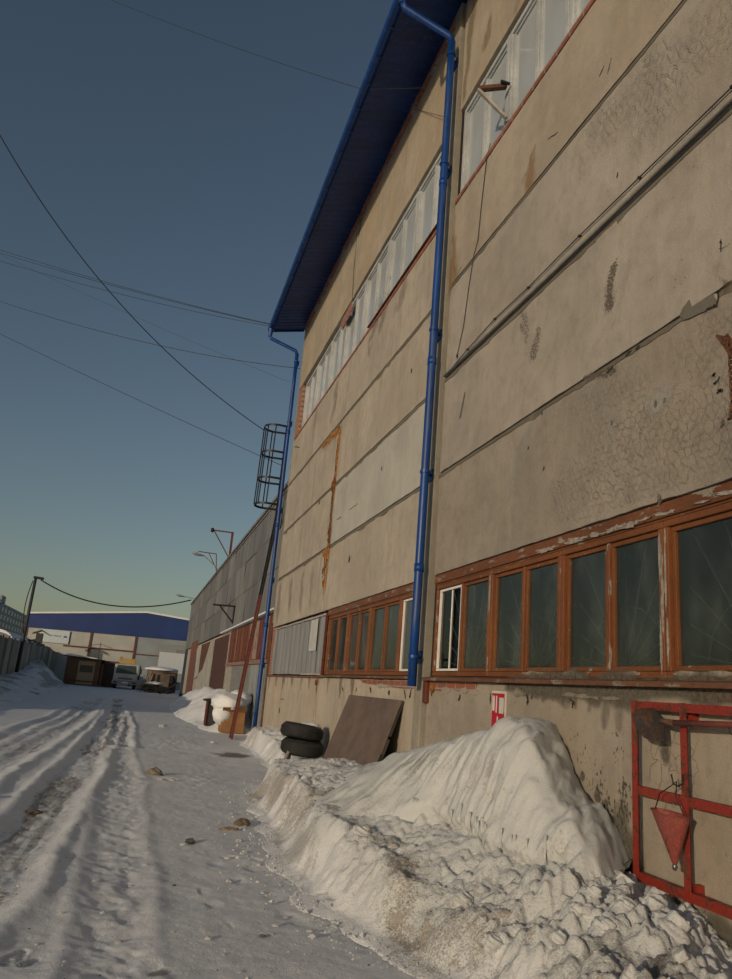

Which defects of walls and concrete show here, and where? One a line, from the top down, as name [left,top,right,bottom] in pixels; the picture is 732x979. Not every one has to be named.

crack [579,0,732,178]
spalling [603,261,617,313]
rust [322,425,341,590]
peeling [536,494,675,554]
peeling [694,490,732,504]
leakage [571,747,643,874]
leakage [705,915,732,948]